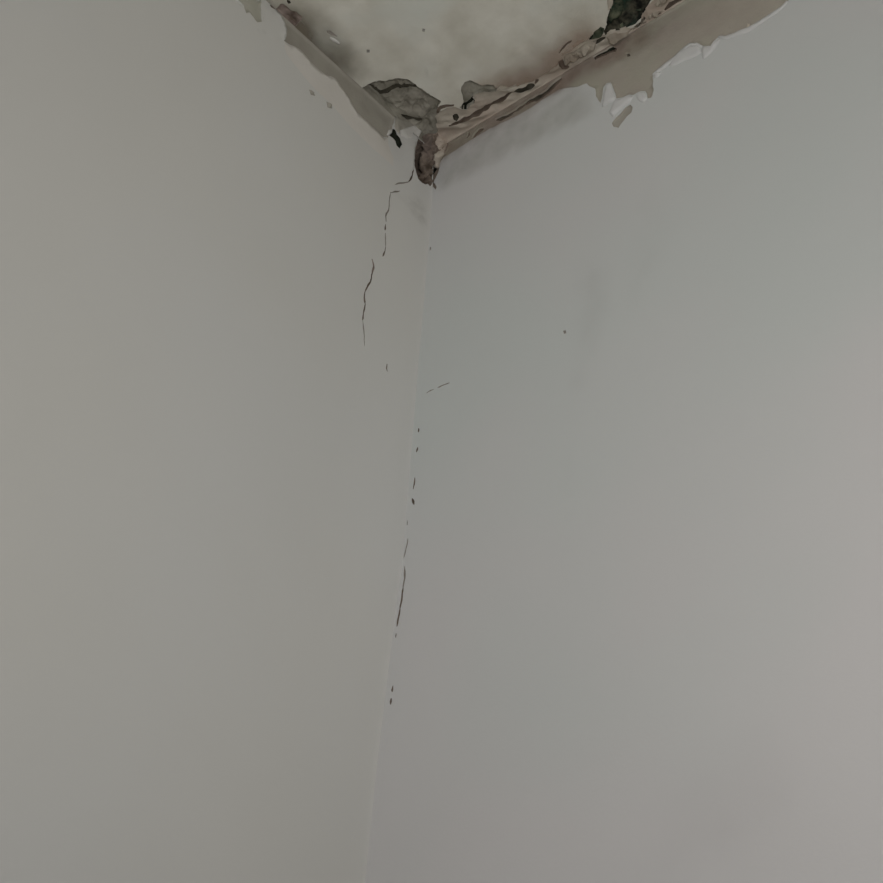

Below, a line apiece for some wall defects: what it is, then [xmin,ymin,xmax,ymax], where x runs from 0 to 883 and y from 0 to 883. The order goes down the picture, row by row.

peeling [236,0,788,190]
crack [362,182,407,346]
crack [395,478,415,638]